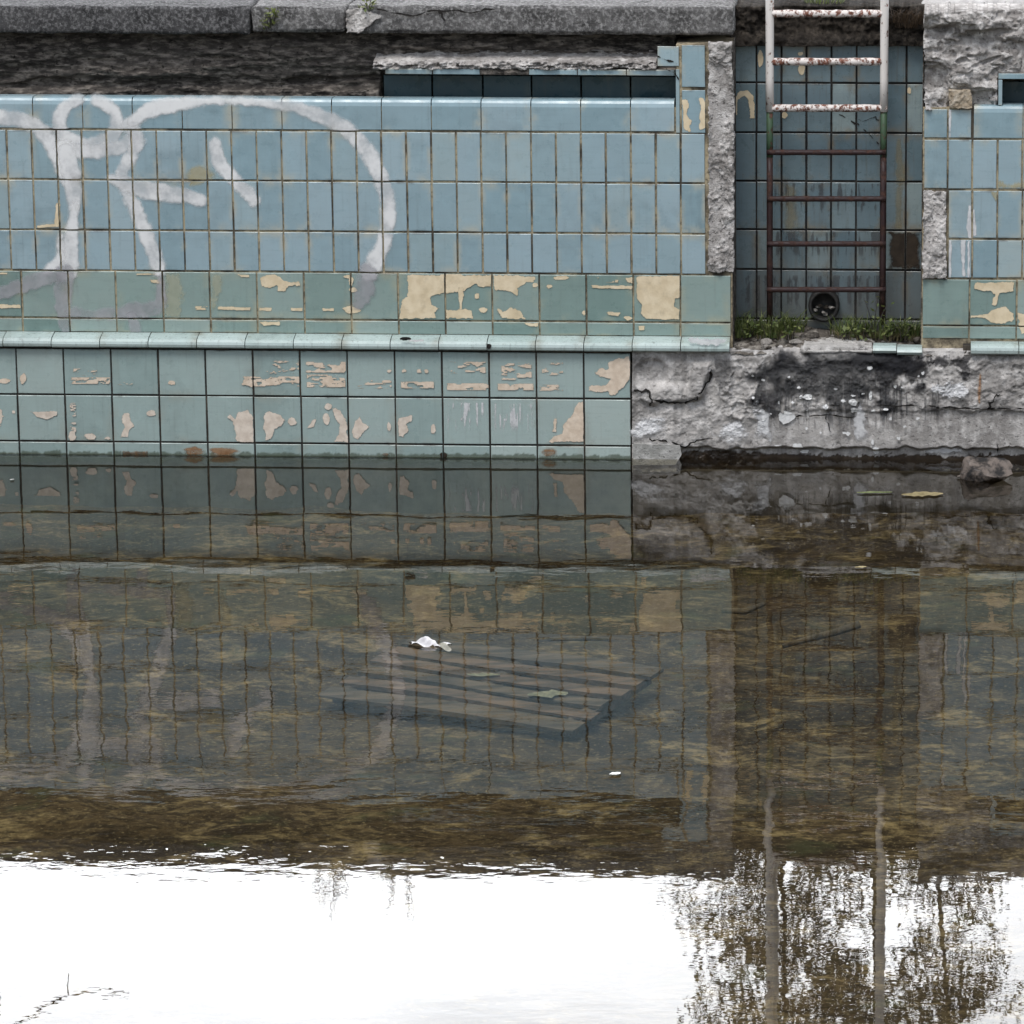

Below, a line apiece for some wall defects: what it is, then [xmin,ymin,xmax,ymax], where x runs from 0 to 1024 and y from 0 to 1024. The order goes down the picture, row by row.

spalling [682,41,755,273]
spalling [922,190,947,280]
peeling [399,274,569,327]
peeling [591,275,680,330]
peeling [971,281,1024,334]
peeling [242,361,346,387]
peeling [227,403,369,443]
peeling [589,356,630,395]
damp [631,418,665,437]
crack [634,369,713,406]
crack [649,438,713,448]
damp [675,347,1024,471]